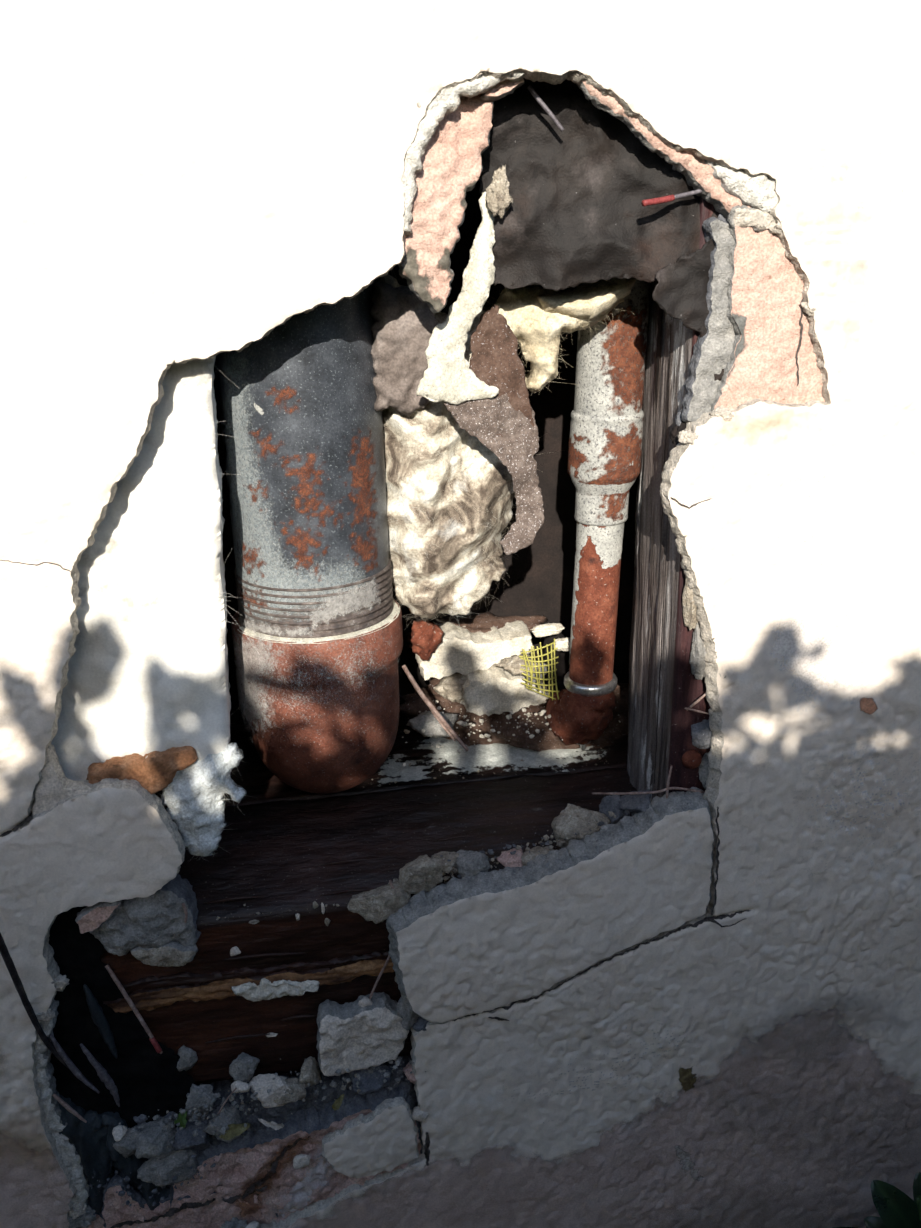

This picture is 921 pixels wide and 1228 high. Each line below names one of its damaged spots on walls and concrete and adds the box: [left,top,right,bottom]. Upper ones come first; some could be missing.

crack [0,560,71,572]
rust [237,543,267,615]
rust [267,387,299,413]
rust [252,429,378,580]
spalling [19,68,831,1110]
rust [567,297,648,521]
crack [452,807,750,1021]
spalling [32,915,426,1228]